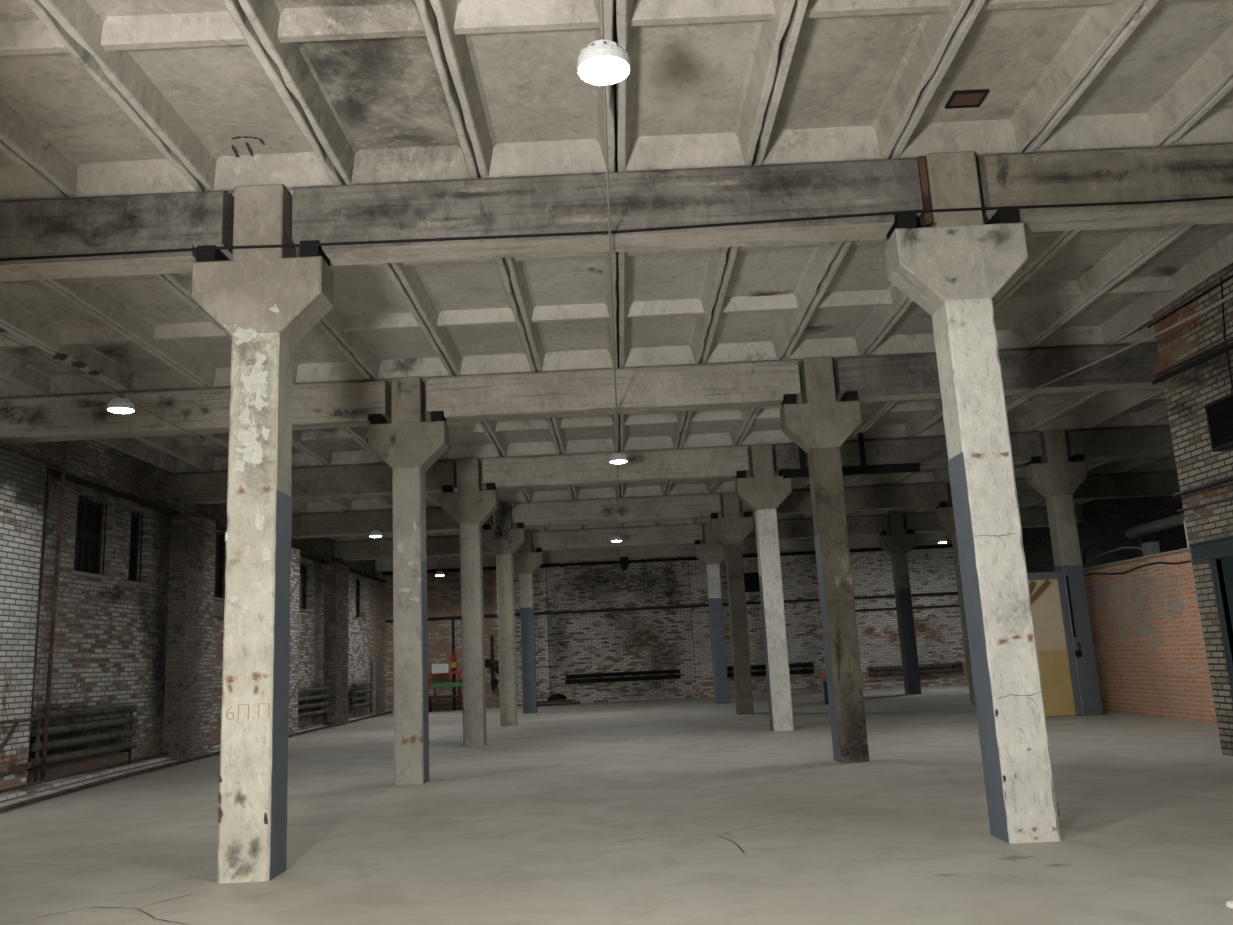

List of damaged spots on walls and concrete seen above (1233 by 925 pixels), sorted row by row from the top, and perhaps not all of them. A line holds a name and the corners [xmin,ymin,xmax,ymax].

leakage [350,38,389,78]
peeling [223,324,271,472]
peeling [254,509,271,561]